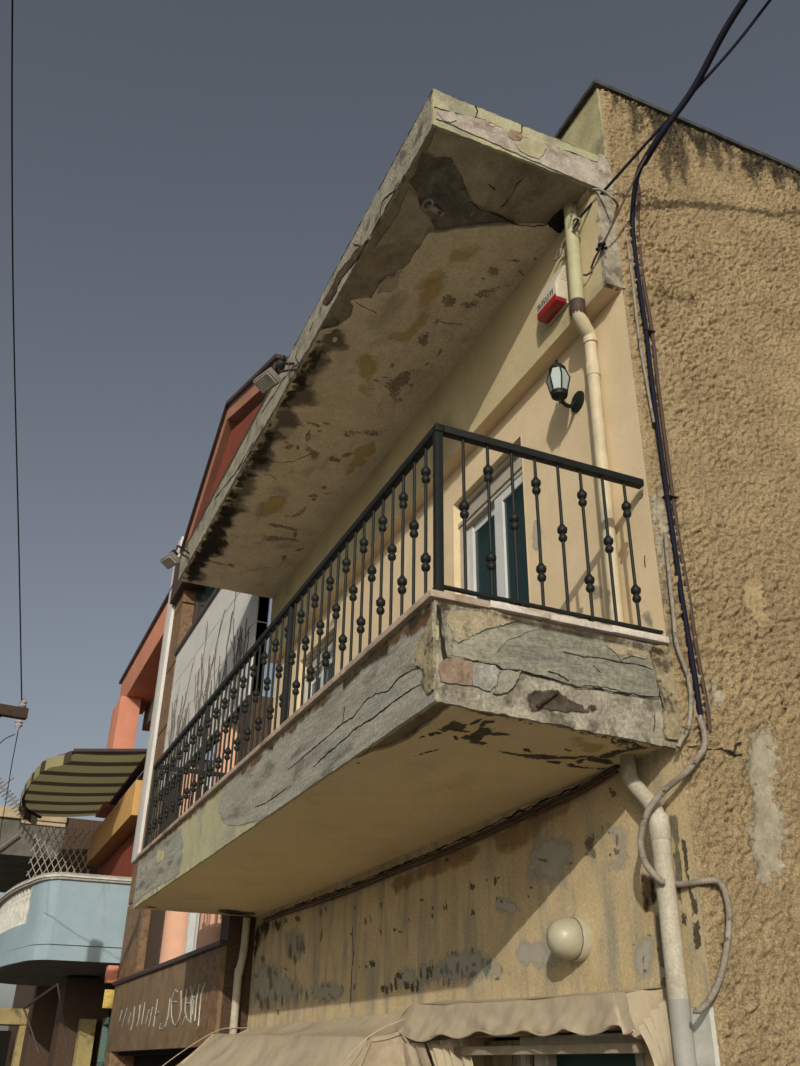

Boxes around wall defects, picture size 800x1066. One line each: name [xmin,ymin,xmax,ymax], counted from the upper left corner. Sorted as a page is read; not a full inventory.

water stain [671,126,797,184]
flaking render [322,110,613,328]
peeling [373,349,442,401]
water stain [185,319,348,582]
crack [436,605,463,660]
crack [256,668,421,807]
peeling [218,577,681,826]
crack [479,651,664,731]
peeling [584,826,628,868]
peeling [669,814,701,950]
peeling [252,915,355,1015]
peeling [381,947,510,995]